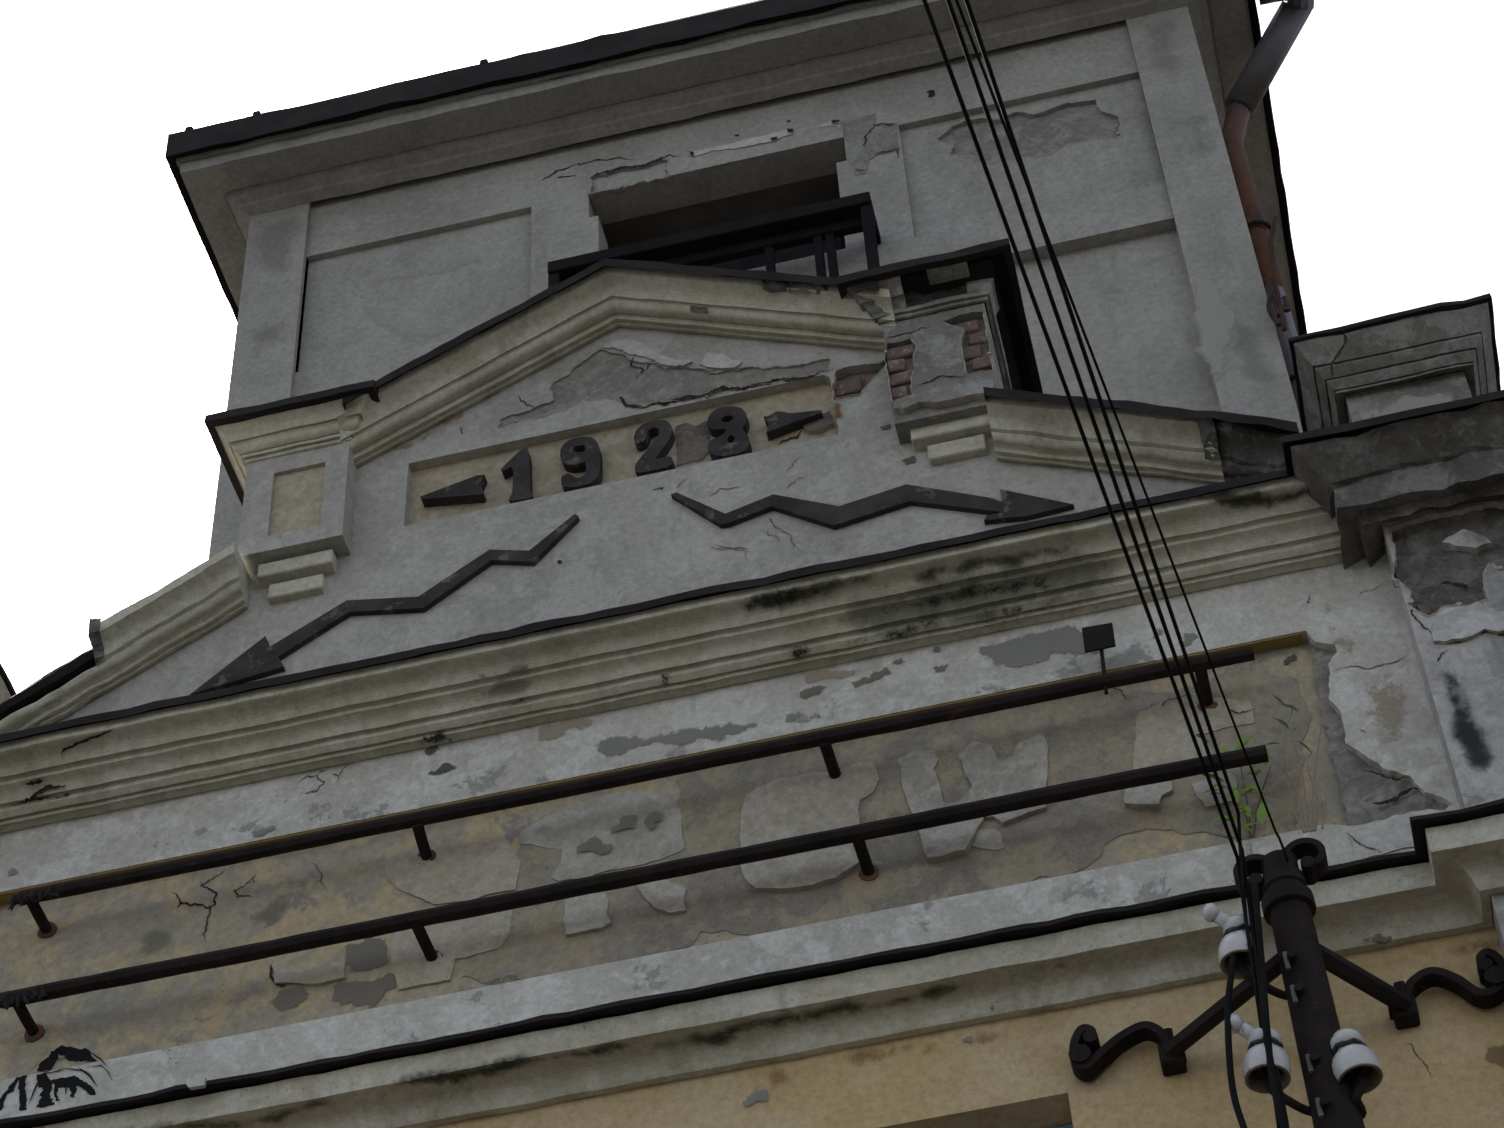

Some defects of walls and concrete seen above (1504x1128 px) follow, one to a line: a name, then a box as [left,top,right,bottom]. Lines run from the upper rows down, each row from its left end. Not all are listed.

spalling [937,99,1121,164]
peeling [497,311,994,434]
peeling [675,421,710,466]
mould [1201,489,1310,508]
damp [746,577,864,609]
mould [854,548,1067,643]
spalling [1387,500,1504,645]
peeling [979,625,1100,667]
damp [481,665,528,705]
damp [1447,675,1491,767]
peeling [270,642,1449,1011]
crack [171,869,256,942]